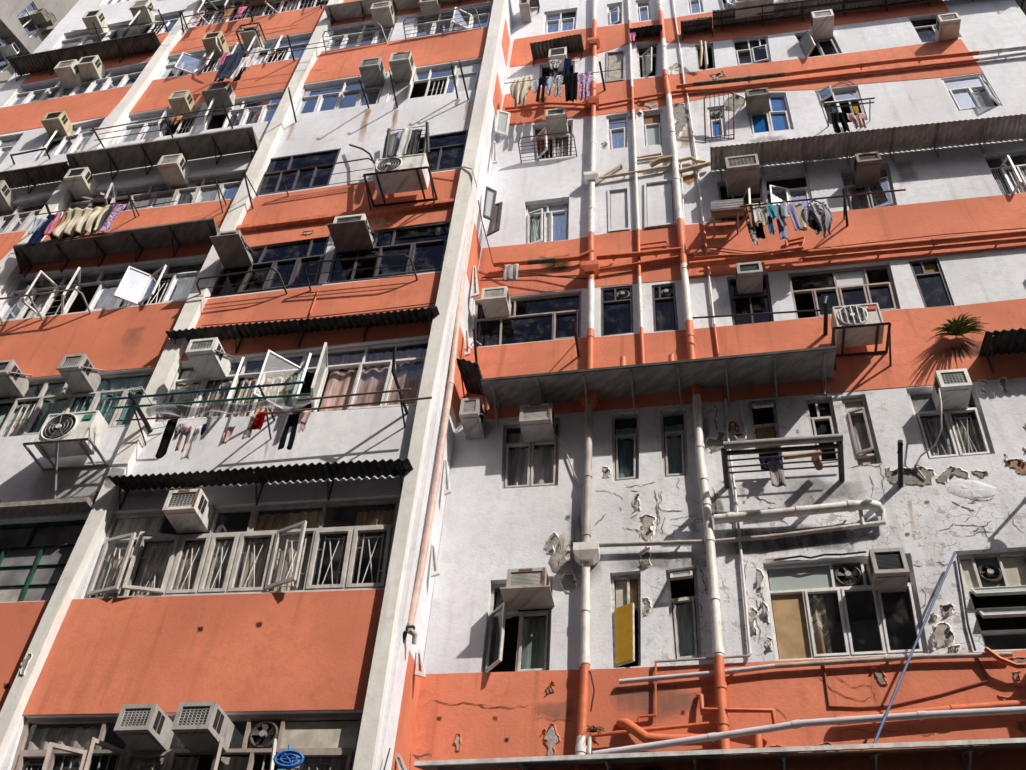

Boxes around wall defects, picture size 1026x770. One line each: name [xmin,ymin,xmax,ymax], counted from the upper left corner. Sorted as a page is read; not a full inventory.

peeling [672,103,690,140]
peeling [885,465,989,487]
spalling [1004,447,1026,476]
crack [594,478,701,536]
peeling [543,531,559,555]
peeling [559,573,580,594]
peeling [748,568,775,652]
peeling [928,603,962,653]
peeling [1008,656,1026,682]
crack [427,700,572,722]